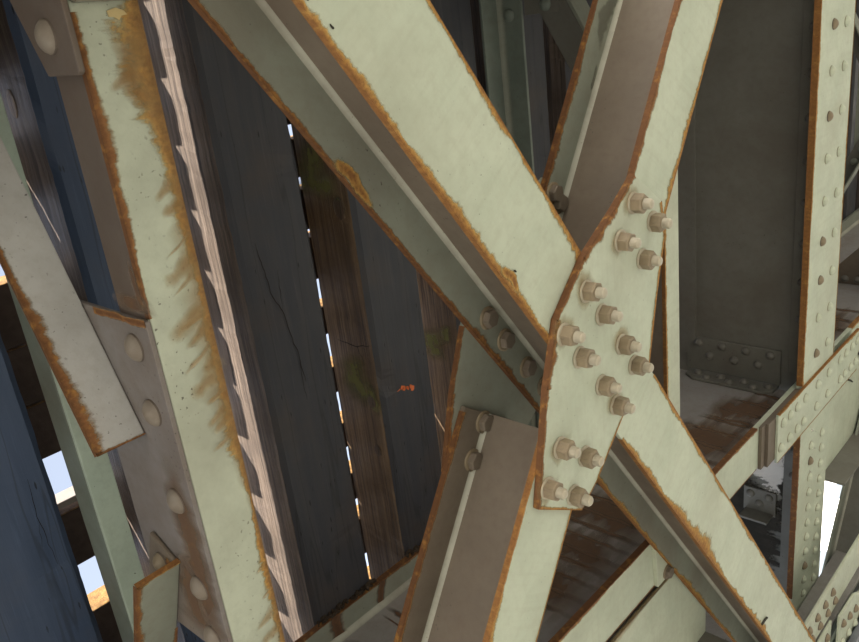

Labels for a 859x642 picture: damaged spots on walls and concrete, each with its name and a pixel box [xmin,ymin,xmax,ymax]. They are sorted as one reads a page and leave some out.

rust [0,247,146,457]
rust [70,12,152,328]
rust [110,0,772,642]
rust [649,0,859,642]